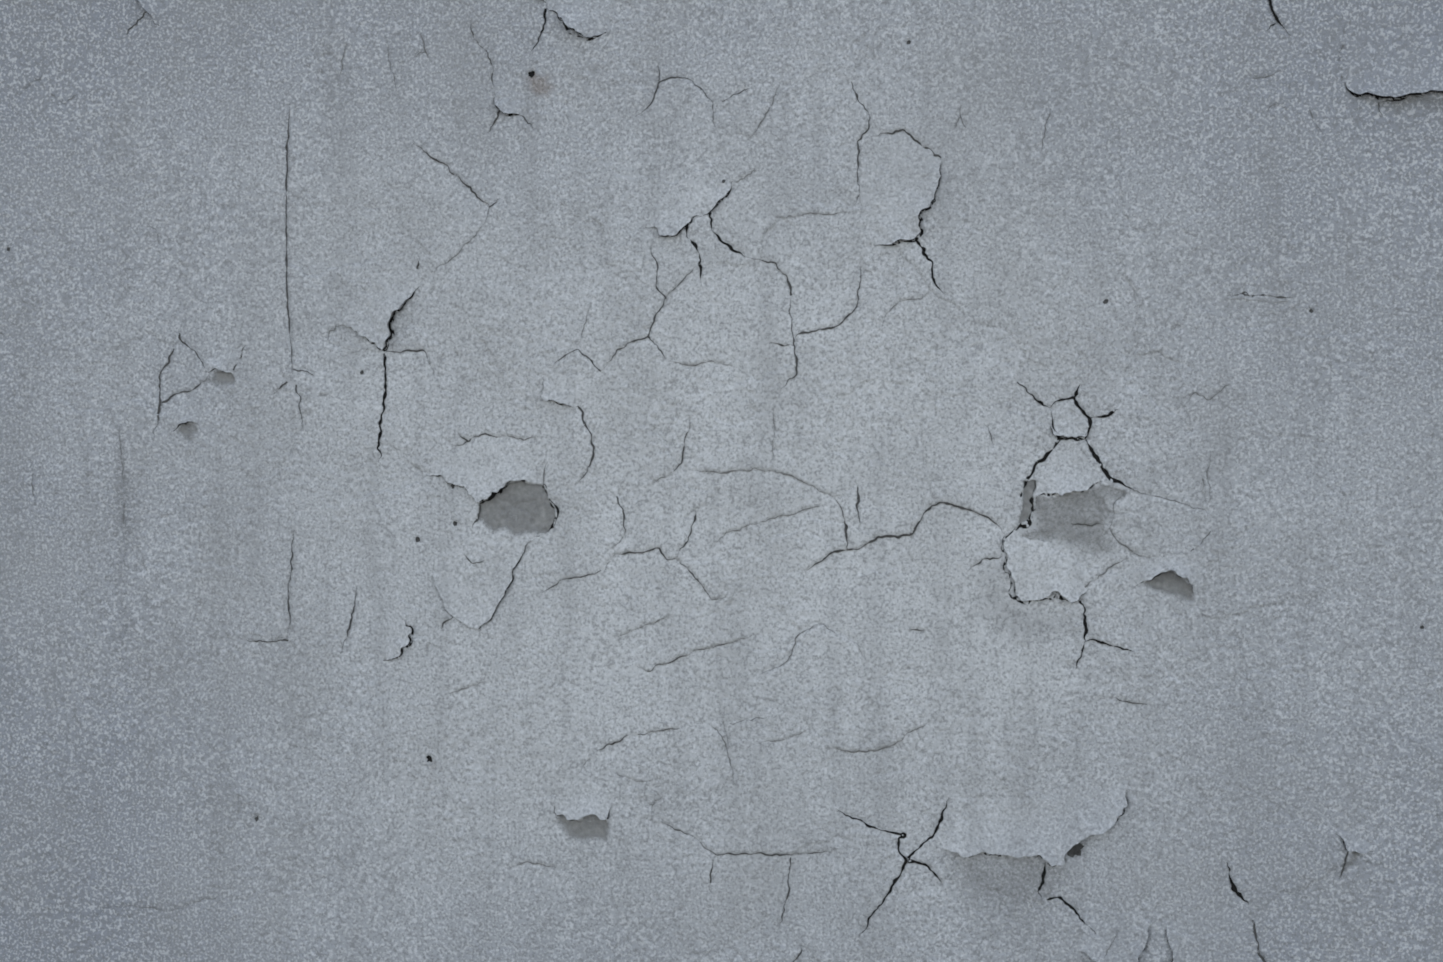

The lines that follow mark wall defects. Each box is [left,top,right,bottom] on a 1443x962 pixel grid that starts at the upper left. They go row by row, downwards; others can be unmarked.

peeling [1338,6,1443,115]
crack [271,104,313,430]
peeling [851,82,946,295]
peeling [426,439,559,629]
crack [545,248,1002,600]
peeling [1001,401,1202,641]
crack [1017,382,1211,570]
peeling [554,778,613,839]
crack [577,728,948,962]
peeling [936,784,1128,867]
crack [1038,862,1119,958]
crack [1227,863,1249,904]